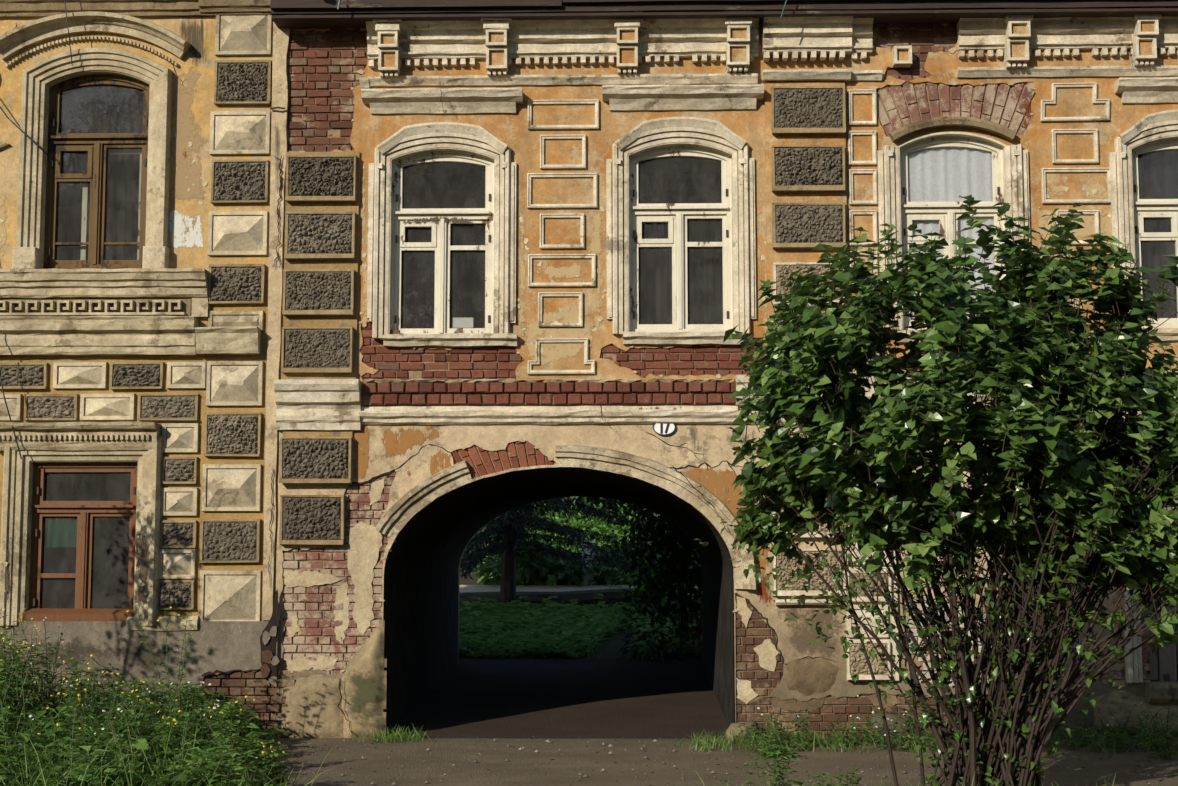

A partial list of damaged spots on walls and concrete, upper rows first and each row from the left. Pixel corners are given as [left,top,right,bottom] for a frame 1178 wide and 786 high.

spalling [869,24,1038,137]
spalling [358,166,767,405]
crack [352,444,455,495]
crack [646,432,742,531]
peeling [681,467,756,521]
spalling [201,425,553,738]
peeling [754,547,769,576]
spalling [733,591,1005,739]